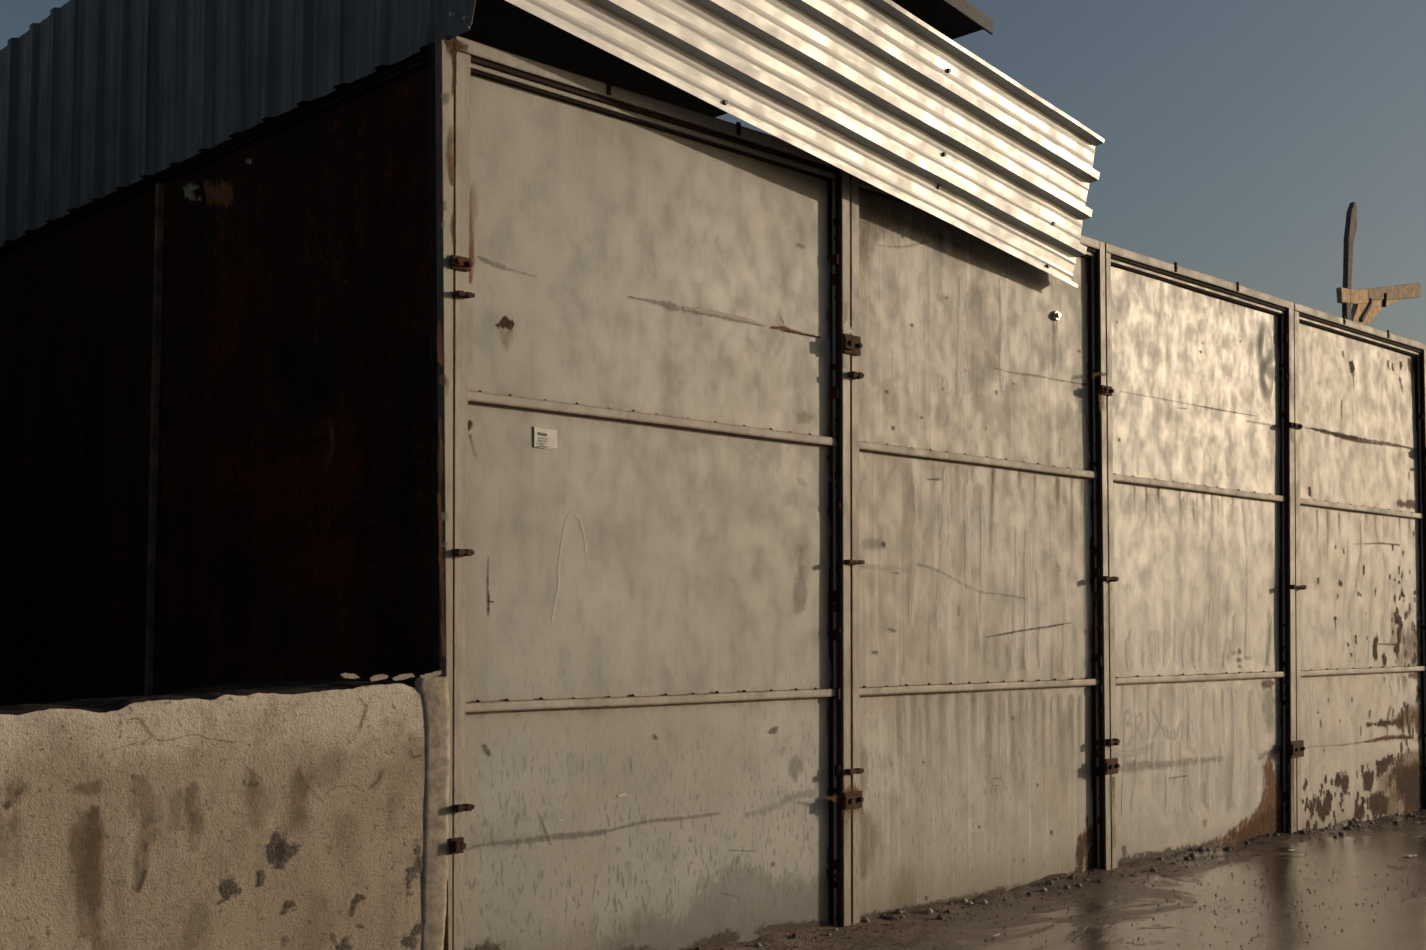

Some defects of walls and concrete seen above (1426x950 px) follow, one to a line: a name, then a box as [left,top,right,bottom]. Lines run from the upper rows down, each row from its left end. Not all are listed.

peeling [183,179,233,208]
rust [496,316,515,331]
rust [1277,326,1291,424]
rust [1213,580,1424,845]